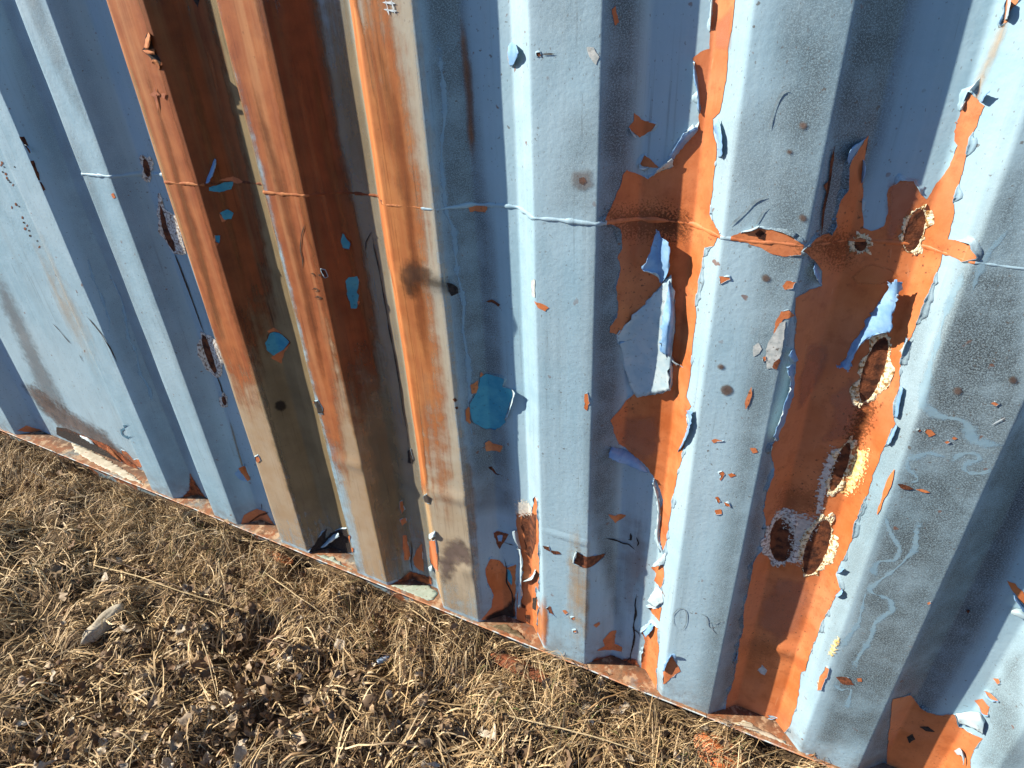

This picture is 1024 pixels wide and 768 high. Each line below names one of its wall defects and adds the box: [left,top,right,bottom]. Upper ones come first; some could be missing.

peeling [206,159,243,192]
rust [847,231,873,255]
rust [898,204,934,256]
rust [106,0,476,601]
peeling [594,0,990,733]
rust [56,427,138,469]
peeling [453,372,515,453]
rust [824,333,895,497]
peeling [482,496,578,633]
rust [760,508,839,577]
peeling [886,677,1001,768]